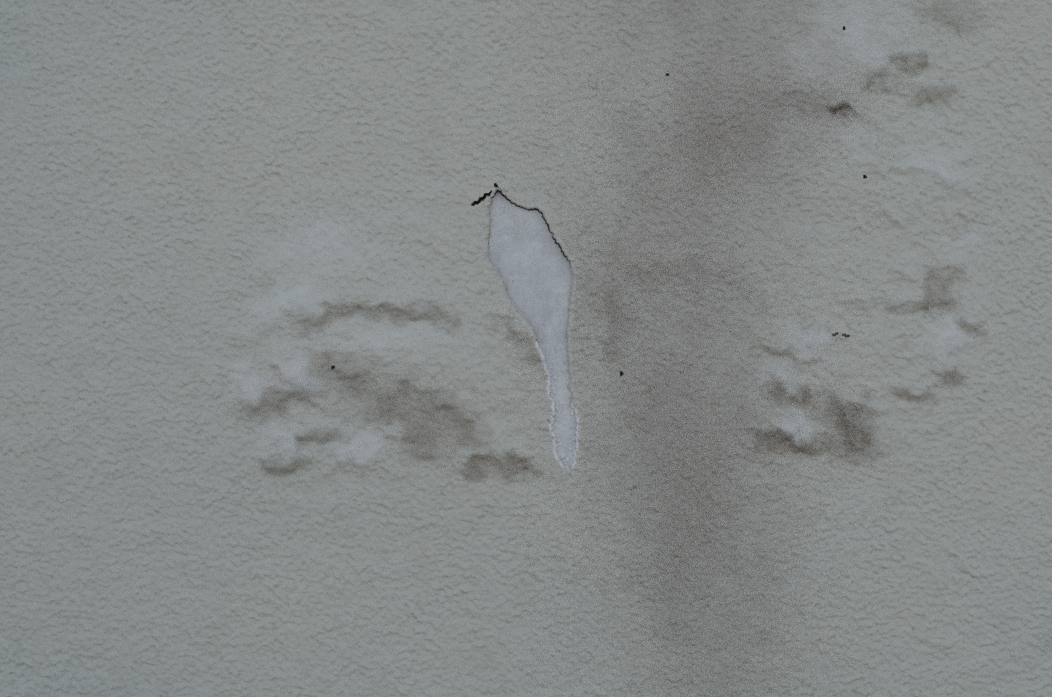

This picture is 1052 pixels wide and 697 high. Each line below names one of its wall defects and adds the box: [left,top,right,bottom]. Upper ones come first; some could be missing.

peeling [485,187,579,469]